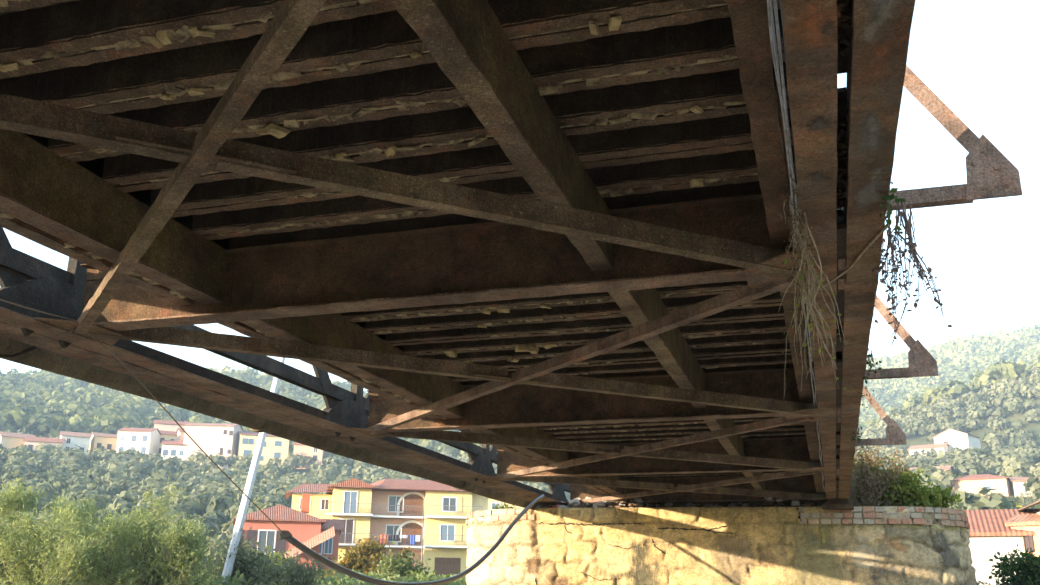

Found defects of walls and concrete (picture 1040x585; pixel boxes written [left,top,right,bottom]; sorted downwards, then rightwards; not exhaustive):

crack [537,522,734,554]
leakage [621,547,645,584]